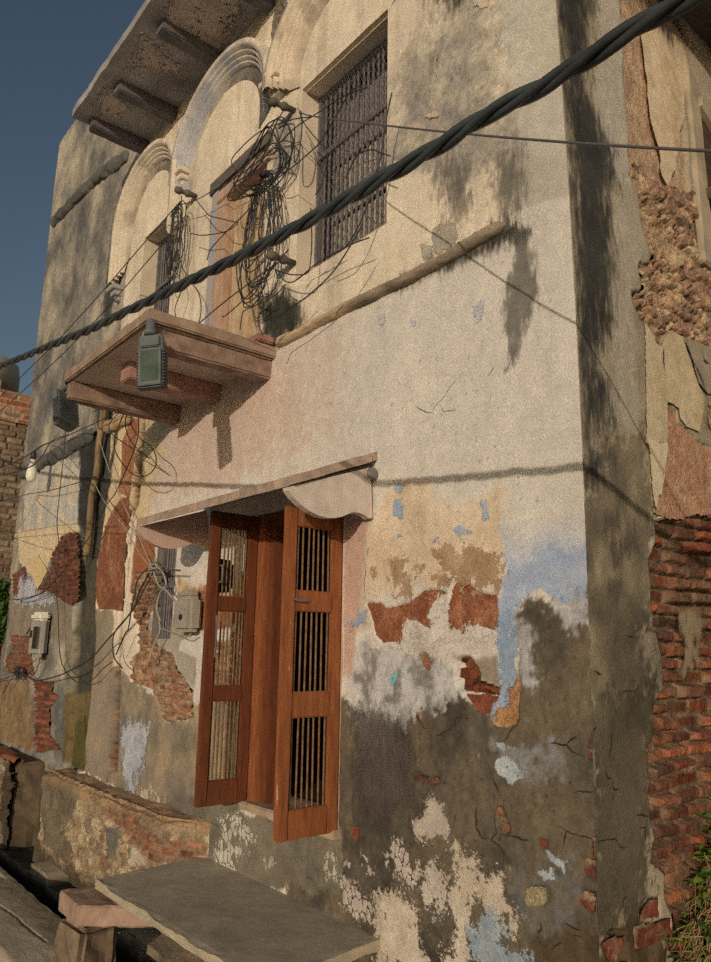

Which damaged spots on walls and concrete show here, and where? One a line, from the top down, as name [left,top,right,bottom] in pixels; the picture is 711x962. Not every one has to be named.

water stain [558,0,595,61]
water stain [258,288,302,341]
water stain [563,74,616,487]
spalling [603,26,711,962]
spalling [12,532,80,611]
spalling [95,419,193,722]
spalling [346,524,522,728]
peeling [119,716,161,803]
crack [549,727,612,758]
peeling [322,772,568,962]
crack [475,779,531,864]
crack [559,814,650,859]